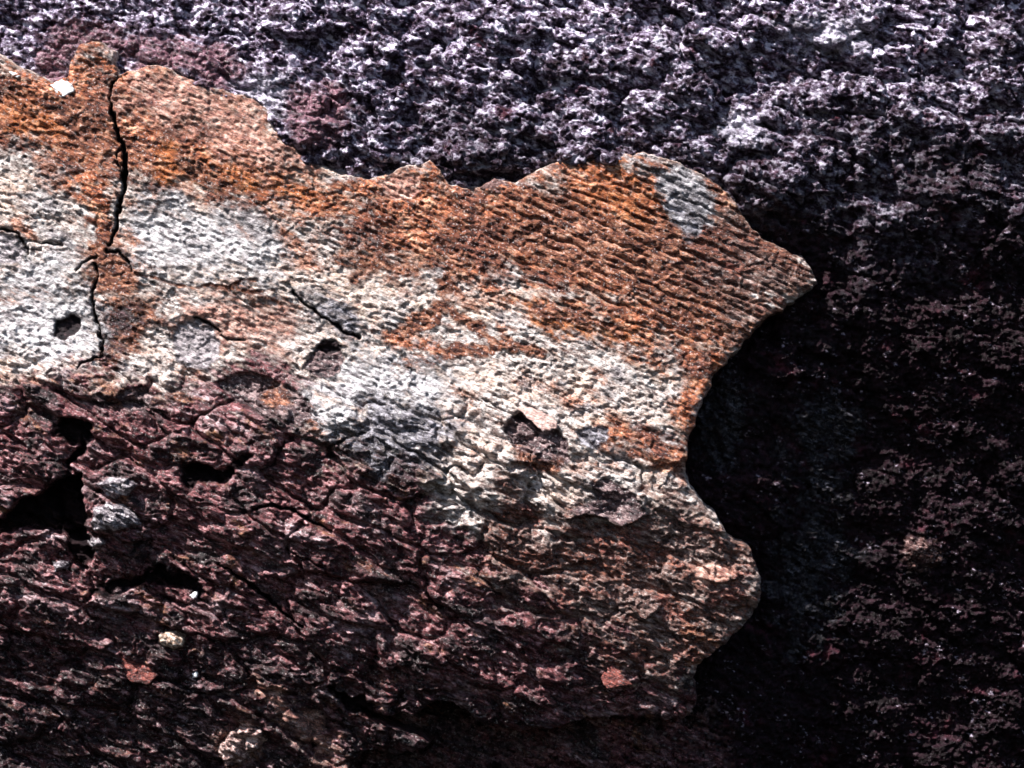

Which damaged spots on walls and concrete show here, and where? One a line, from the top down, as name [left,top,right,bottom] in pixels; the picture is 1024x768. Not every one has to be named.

peeling [51,80,75,97]
crack [76,76,132,369]
spalling [54,314,81,340]
spalling [173,320,220,369]
spalling [304,340,344,378]
crack [300,299,360,339]
corrosion [0,41,817,686]
spalling [504,407,608,475]
peeling [568,479,645,526]
peeling [698,562,735,581]
peeling [120,655,159,685]
peeling [601,663,632,689]